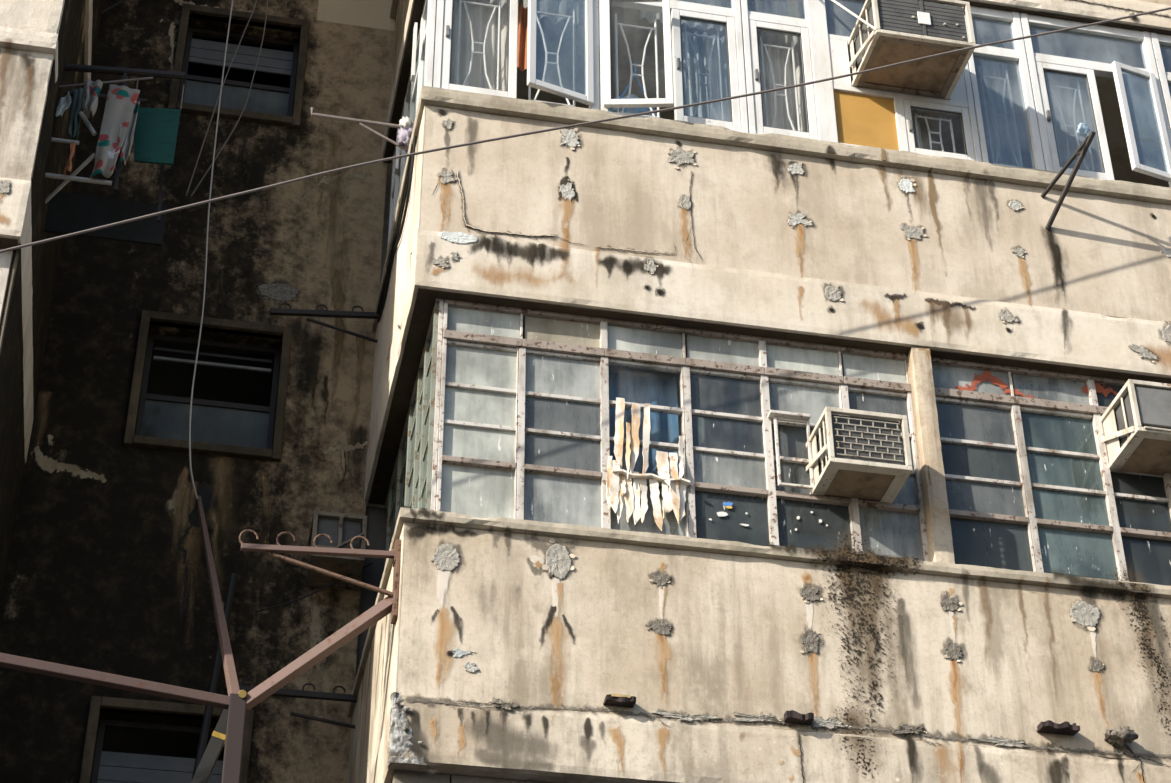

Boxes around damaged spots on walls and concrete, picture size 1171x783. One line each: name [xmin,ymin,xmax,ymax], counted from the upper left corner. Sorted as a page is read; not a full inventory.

rust [439,176,451,219]
leakage [471,235,568,265]
crack [432,170,701,257]
leakage [599,256,670,280]
rust [796,224,804,256]
rust [908,239,918,274]
spalling [429,541,462,610]
spalling [527,539,576,617]
rust [436,608,453,677]
leakage [768,533,923,778]
leakage [1052,562,1171,735]
spalling [386,692,427,772]